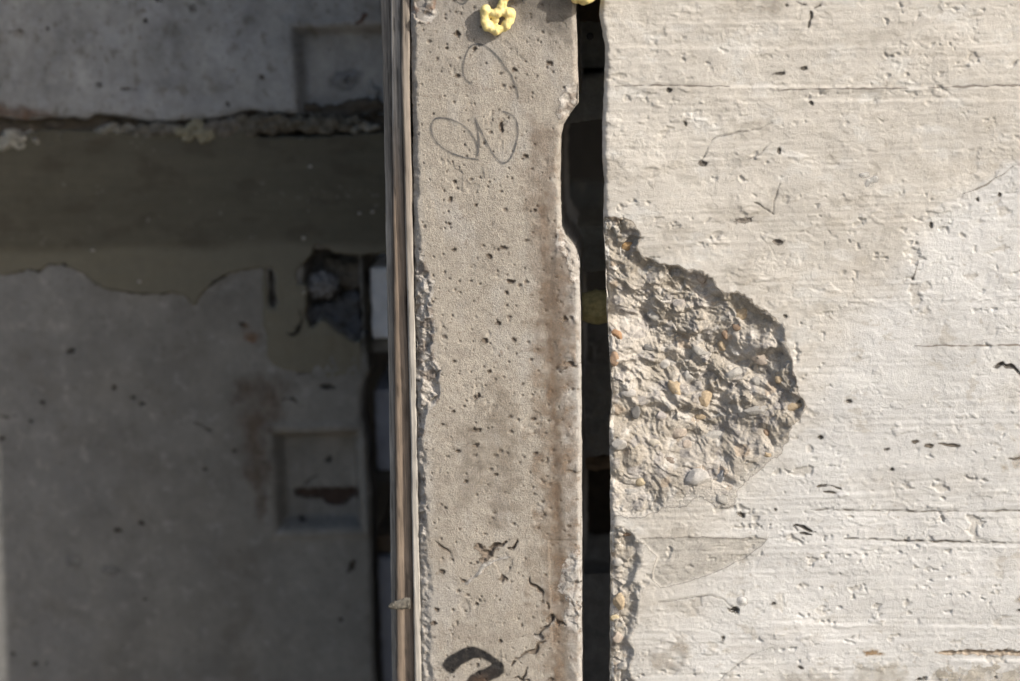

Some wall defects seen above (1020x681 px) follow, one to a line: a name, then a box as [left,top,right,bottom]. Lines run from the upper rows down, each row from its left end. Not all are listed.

spalling [308,253,374,350]
spalling [604,217,807,681]